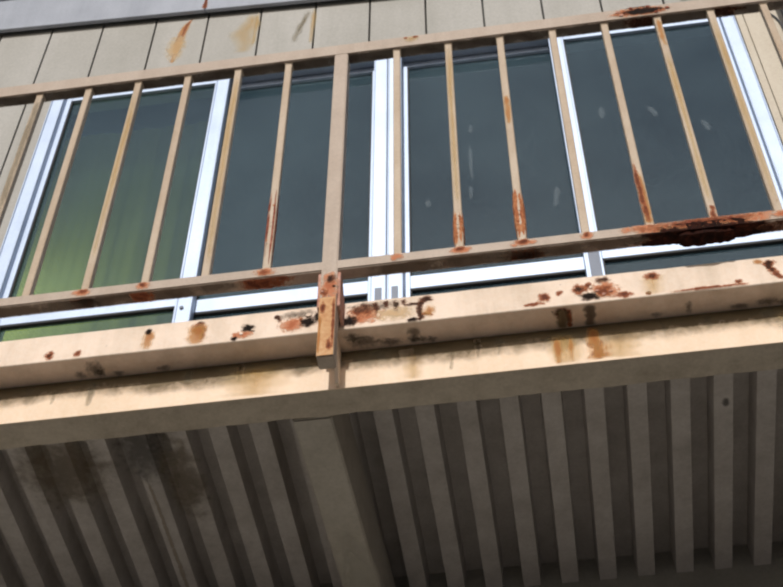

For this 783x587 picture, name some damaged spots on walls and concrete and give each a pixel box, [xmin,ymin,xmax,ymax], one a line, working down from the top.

rust [633,165,652,222]
rust [754,260,783,278]
rust [674,279,746,292]
rust [524,291,563,306]
rust [316,272,338,356]
rust [349,299,407,323]
rust [554,308,573,328]
rust [144,329,154,347]
rust [189,322,206,343]
leakage [341,300,783,366]
rust [583,305,608,358]
leakage [0,355,318,403]